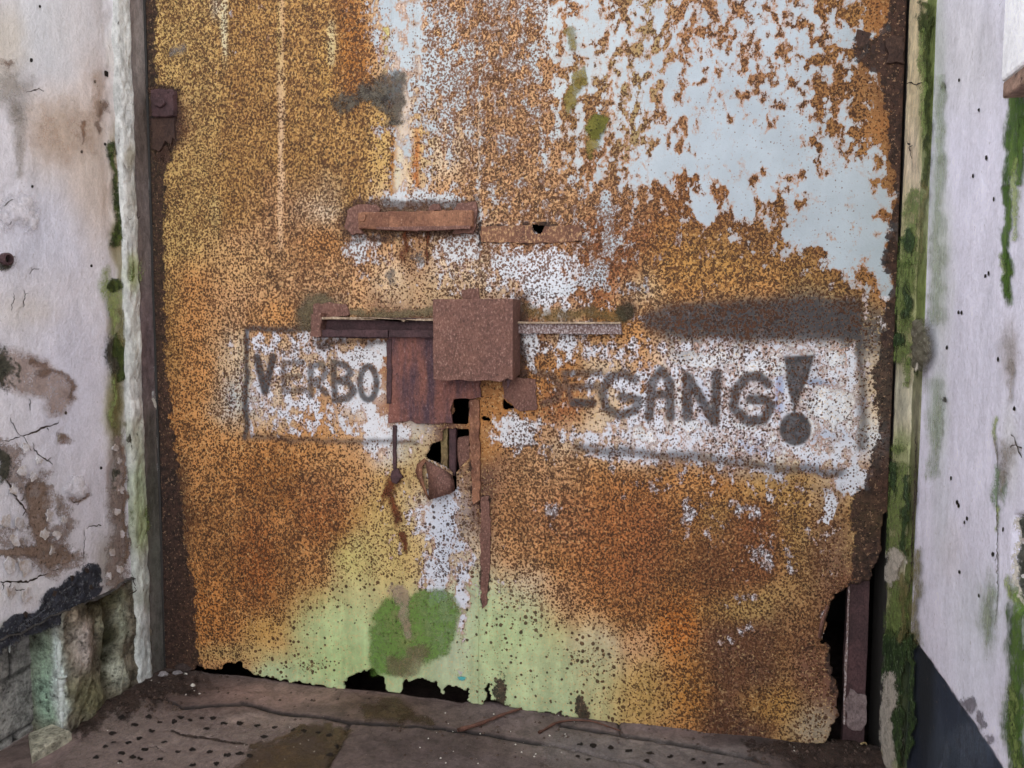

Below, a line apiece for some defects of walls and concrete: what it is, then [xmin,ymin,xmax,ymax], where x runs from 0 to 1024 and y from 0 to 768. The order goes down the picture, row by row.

corrosion [398,231,409,261]
water stain [0,345,76,414]
water stain [104,332,125,382]
crack [2,399,59,465]
crack [6,479,27,515]
crack [1,569,59,591]
flaking render [0,435,132,656]
corrosion [381,479,408,553]
water stain [884,547,908,588]
water stain [879,671,904,768]